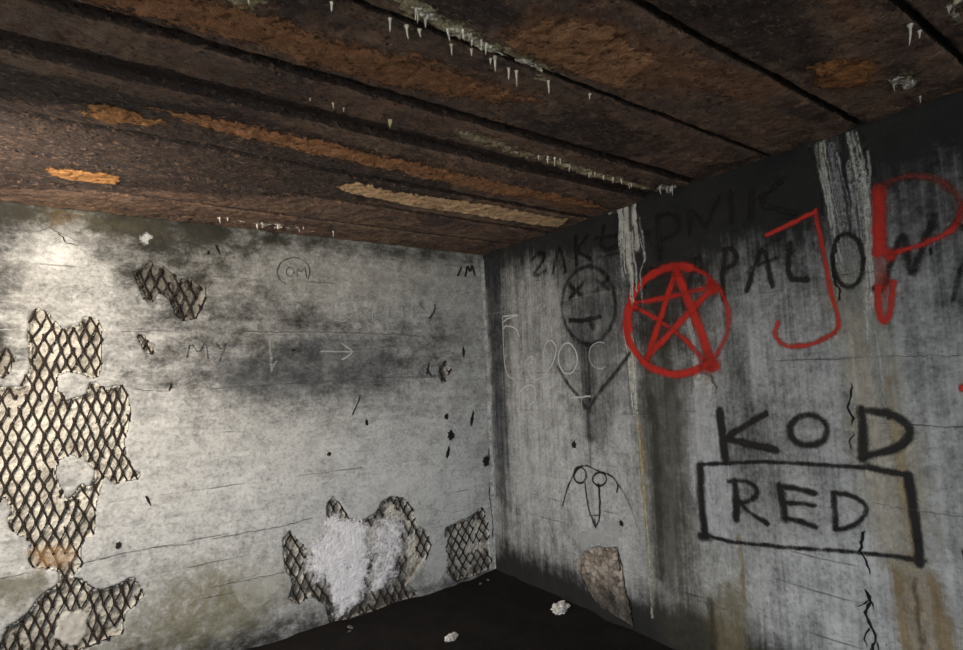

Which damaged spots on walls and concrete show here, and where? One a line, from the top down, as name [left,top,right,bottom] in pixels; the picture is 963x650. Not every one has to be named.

leakage [388,0,550,92]
leakage [217,217,312,232]
flaking render [134,262,207,321]
leakage [814,130,892,547]
flaking render [0,308,143,650]
leakage [304,513,405,618]
flaking render [283,496,432,623]
flaking render [445,507,492,582]
flaking render [576,547,634,627]
crack [857,531,879,650]